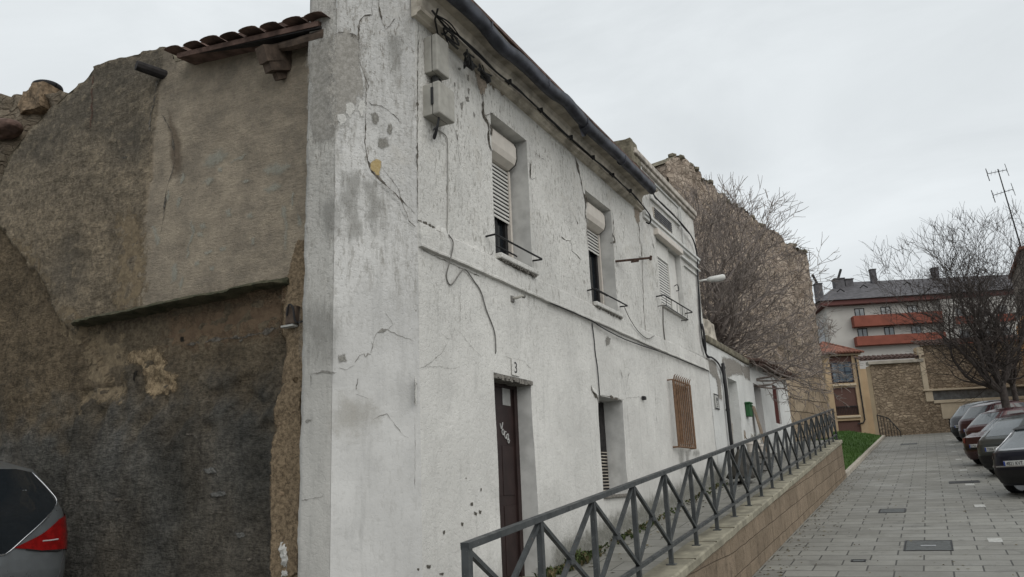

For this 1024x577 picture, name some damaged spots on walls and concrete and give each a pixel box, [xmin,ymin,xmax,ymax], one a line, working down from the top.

flaking render [307,28,392,148]
crack [336,0,493,369]
spalling [12,238,179,415]
crack [309,314,410,438]